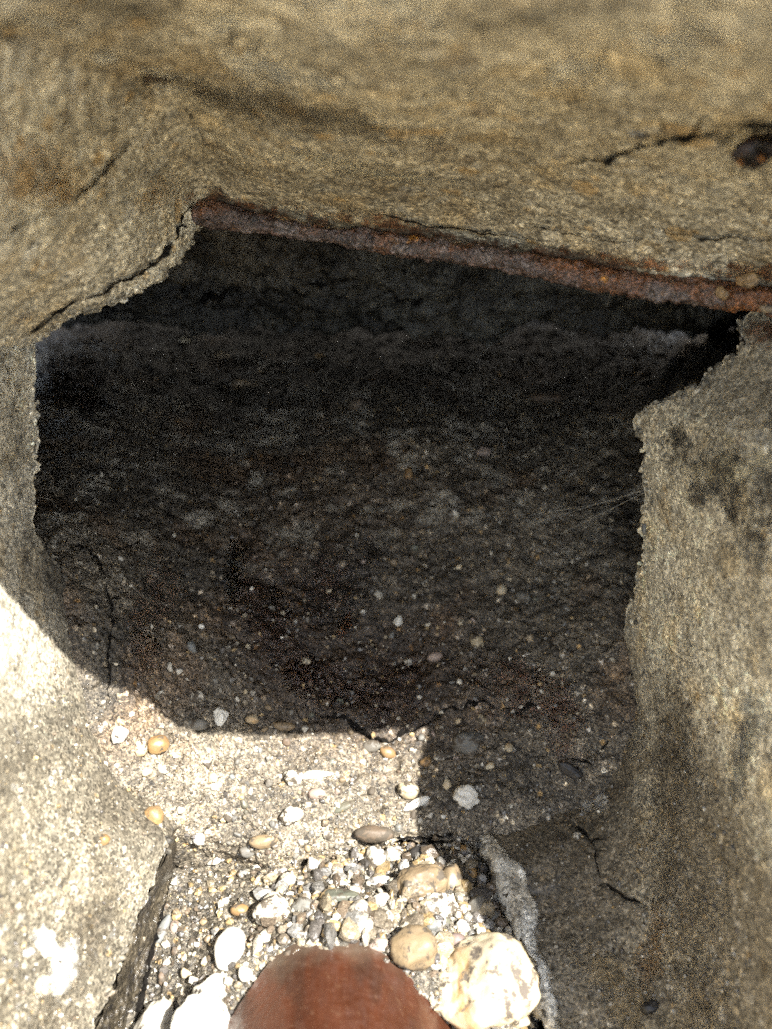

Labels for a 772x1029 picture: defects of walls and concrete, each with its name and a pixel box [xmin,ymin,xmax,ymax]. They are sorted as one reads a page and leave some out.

crack [0,142,132,243]
crack [570,120,772,166]
crack [30,197,451,335]
corrosion [188,193,772,342]
crack [320,700,610,766]
crack [575,825,648,907]
crack [134,887,169,1025]